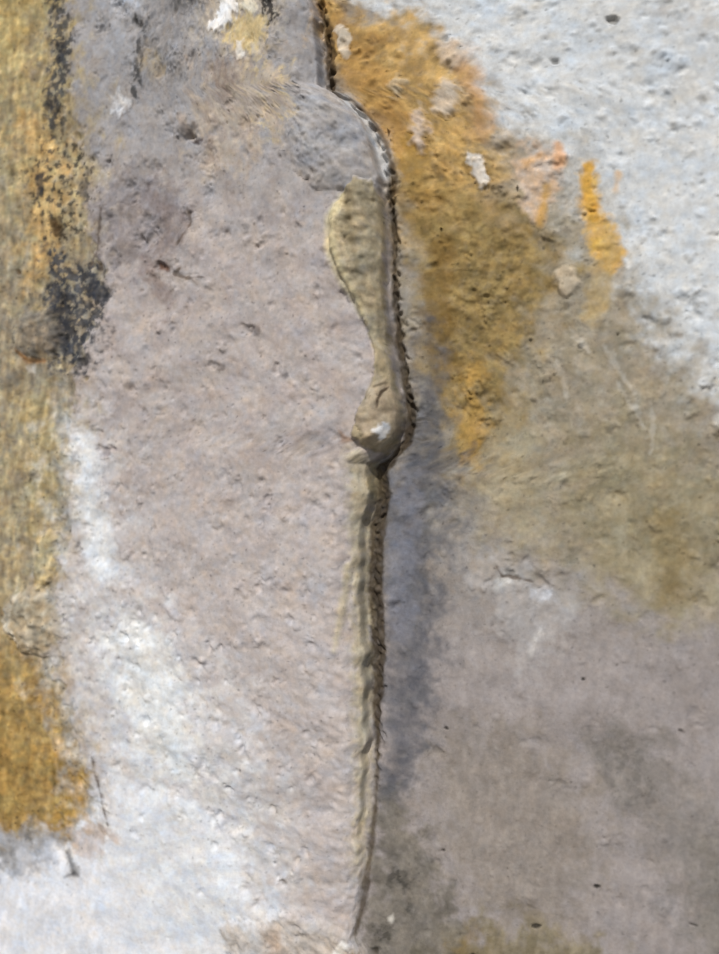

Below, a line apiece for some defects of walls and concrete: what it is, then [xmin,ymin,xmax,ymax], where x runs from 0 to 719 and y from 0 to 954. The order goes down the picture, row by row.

water stain [0,0,341,954]
crack [315,0,440,939]
rust [300,0,630,493]
water stain [351,182,719,954]
water stain [514,123,607,261]